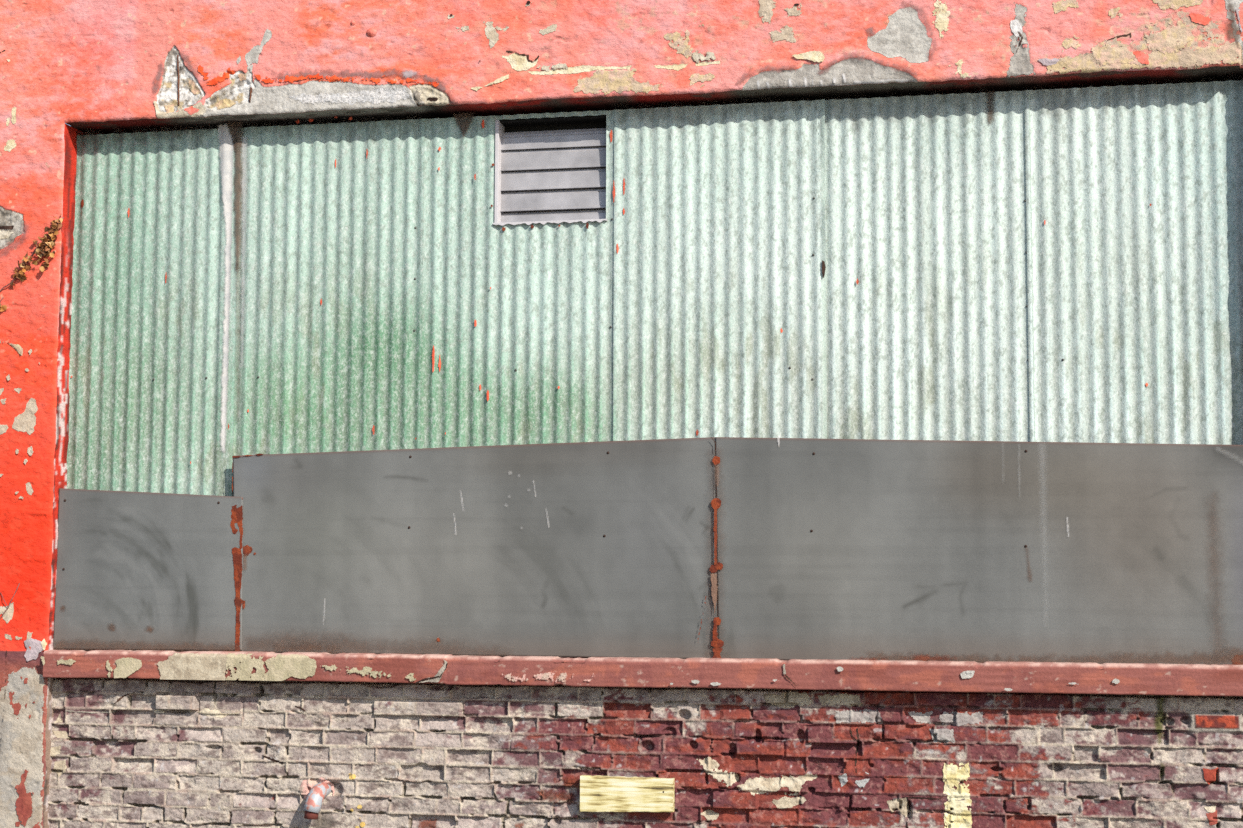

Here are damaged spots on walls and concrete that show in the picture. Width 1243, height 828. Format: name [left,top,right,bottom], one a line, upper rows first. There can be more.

peeling [153,29,455,119]
peeling [471,18,662,95]
peeling [737,0,950,90]
peeling [1007,0,1243,77]
peeling [0,374,38,464]
rust [230,453,263,651]
rust [698,437,724,658]
peeling [0,602,76,828]
peeling [157,653,416,681]
peeling [764,679,883,724]
peeling [909,711,983,743]
peeling [696,757,817,809]